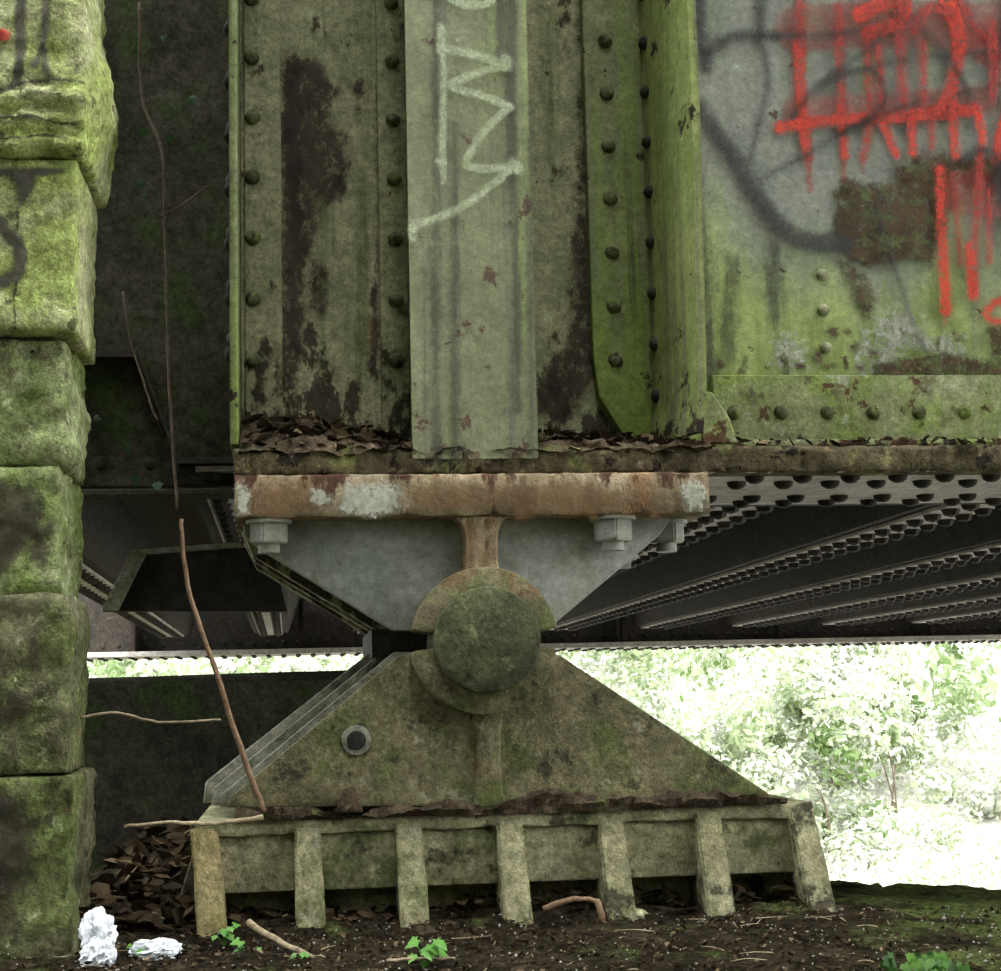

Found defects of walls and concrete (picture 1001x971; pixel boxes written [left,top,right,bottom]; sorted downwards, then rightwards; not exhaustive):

corrosion [831,151,1001,319]
peeling [235,484,251,514]
peeling [310,481,401,518]
peeling [680,480,708,511]